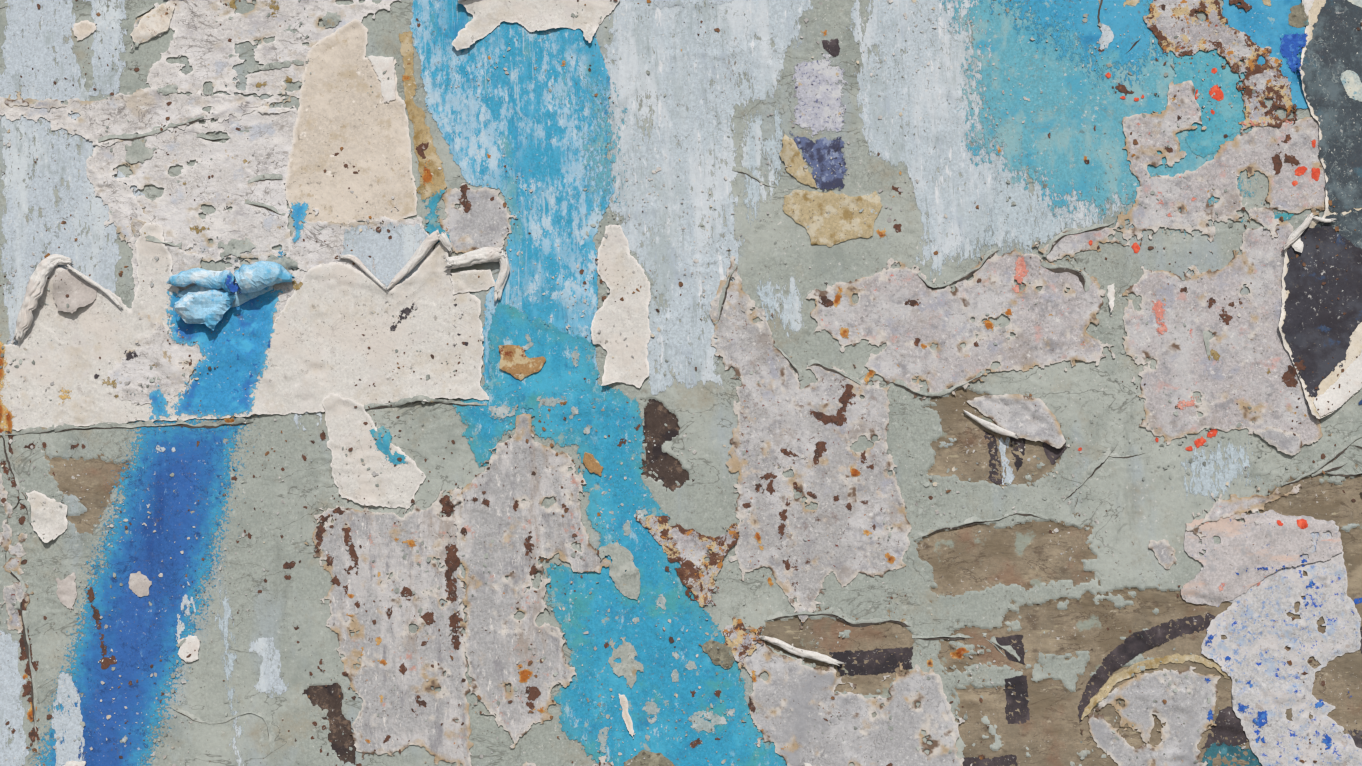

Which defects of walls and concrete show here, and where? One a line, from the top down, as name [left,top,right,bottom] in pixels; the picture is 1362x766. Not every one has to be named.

rust [1261,104,1297,120]
rust [1271,134,1300,174]
rust [579,258,660,312]
rust [0,334,47,525]
peeling [671,0,1362,766]
peeling [302,395,694,766]